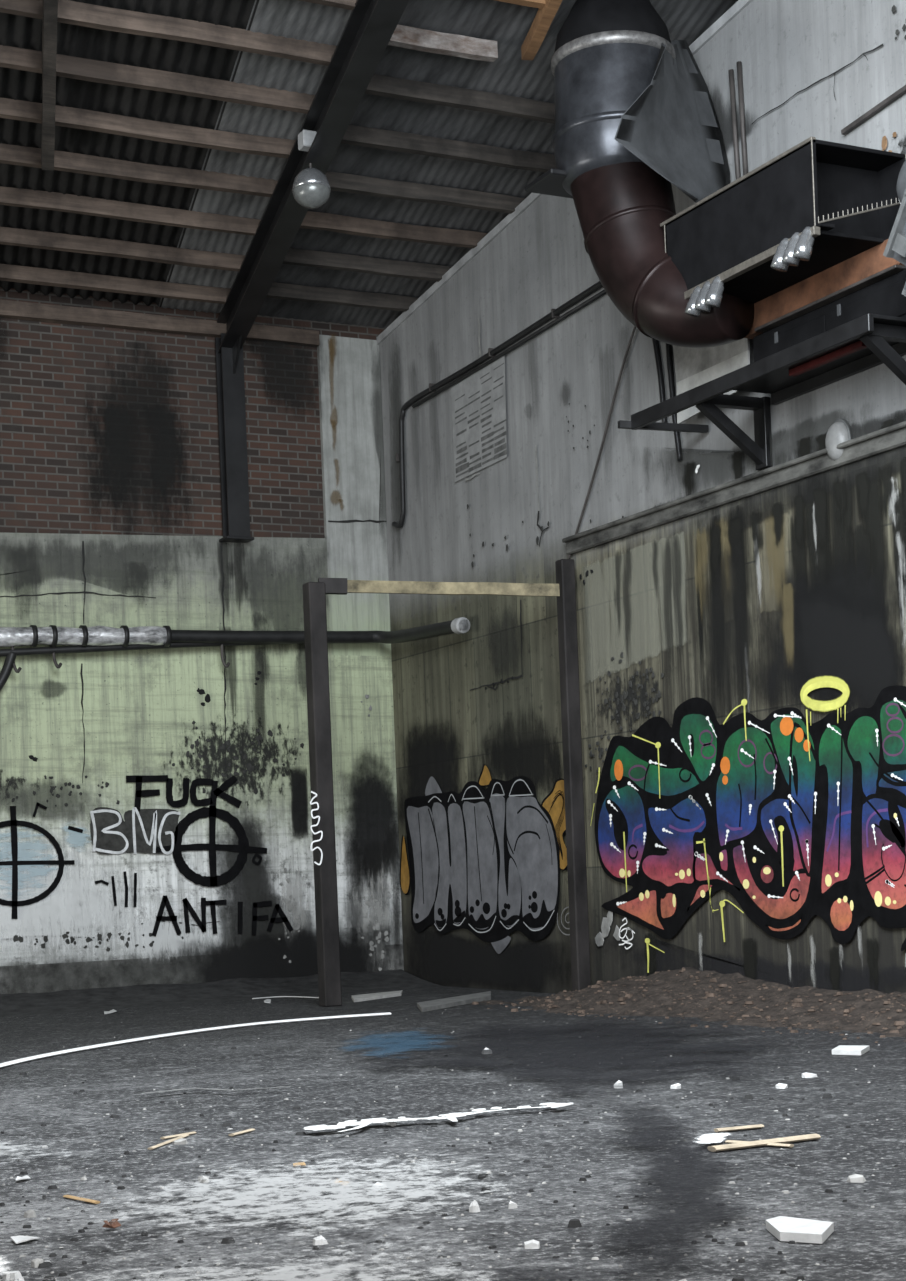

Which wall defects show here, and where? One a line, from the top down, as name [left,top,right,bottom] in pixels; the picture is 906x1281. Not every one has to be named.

damp [218,542,246,608]
corrosion [695,519,730,614]
corrosion [767,515,793,661]
damp [225,646,236,711]
damp [255,651,264,737]